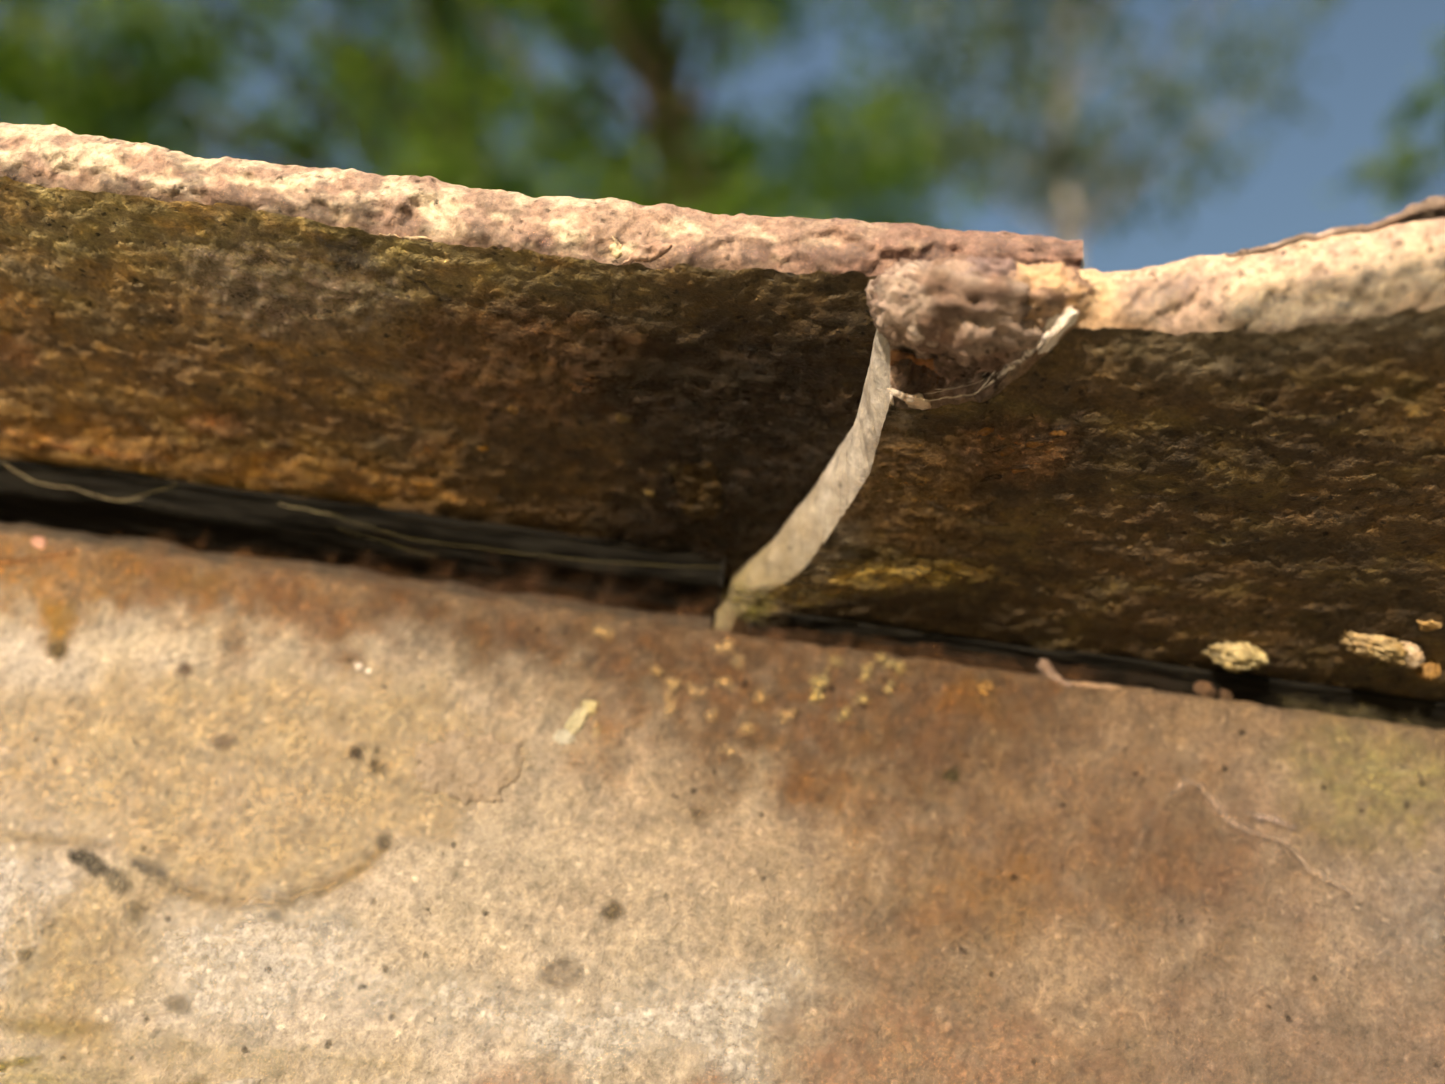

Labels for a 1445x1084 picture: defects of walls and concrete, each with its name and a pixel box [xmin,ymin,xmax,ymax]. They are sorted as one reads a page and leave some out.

spalling [0,122,1445,410]
leakage [576,321,862,568]
leakage [455,615,1058,802]